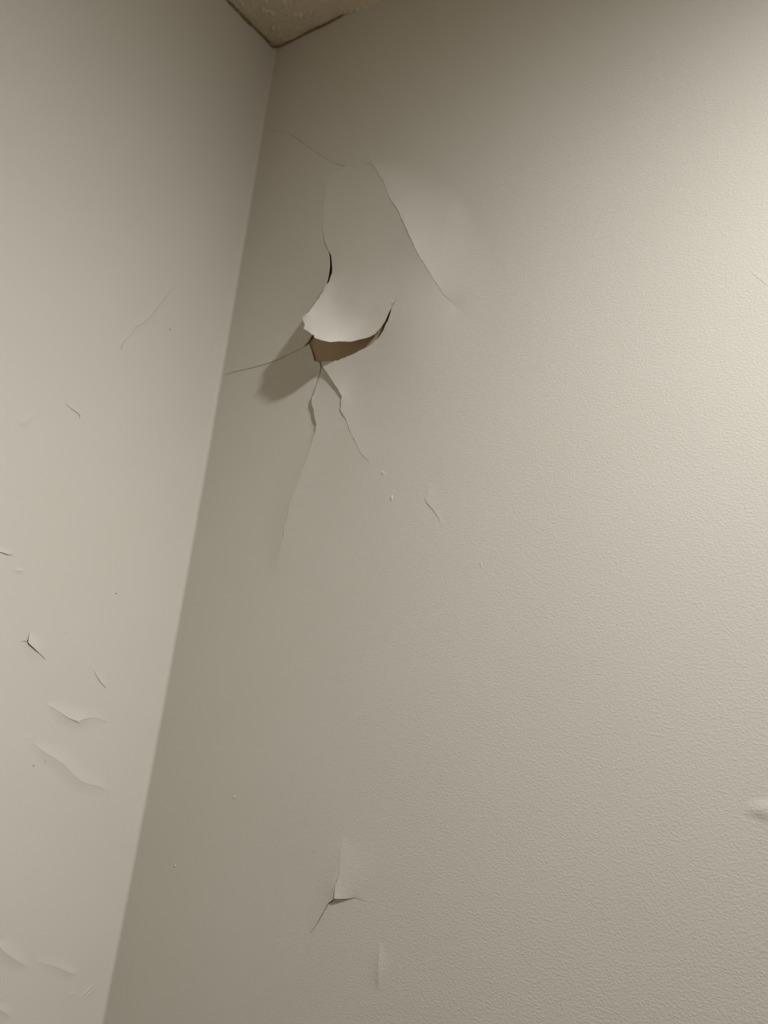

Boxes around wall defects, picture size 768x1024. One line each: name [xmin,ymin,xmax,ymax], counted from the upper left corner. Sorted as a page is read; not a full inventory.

peeling [226,131,514,616]